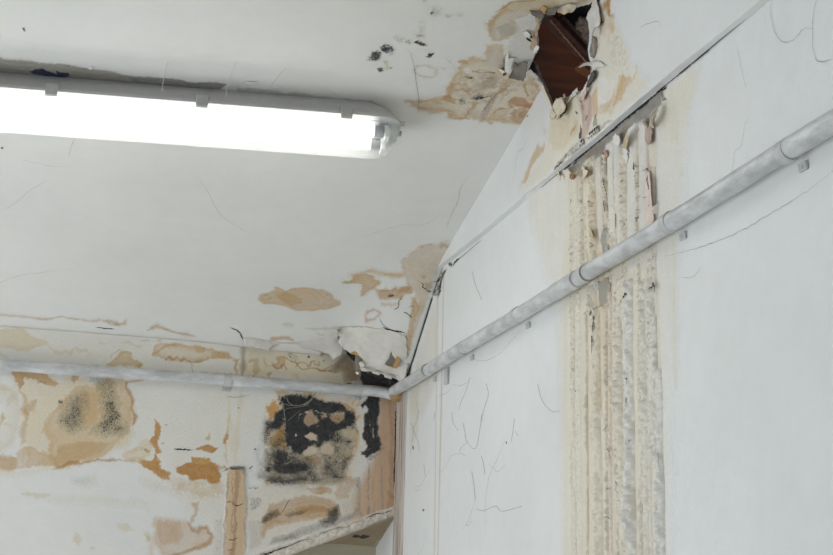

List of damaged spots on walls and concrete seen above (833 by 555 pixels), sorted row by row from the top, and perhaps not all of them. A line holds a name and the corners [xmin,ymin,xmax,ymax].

flaking render [523,4,576,54]
flaking render [499,51,528,81]
flaking render [542,0,661,181]
water stain [257,285,342,312]
water stain [340,240,451,372]
water stain [0,312,361,384]
water stain [0,371,394,555]
crack [391,411,399,484]
water stain [407,368,443,555]
flaking render [220,465,253,555]
crack [261,509,393,555]